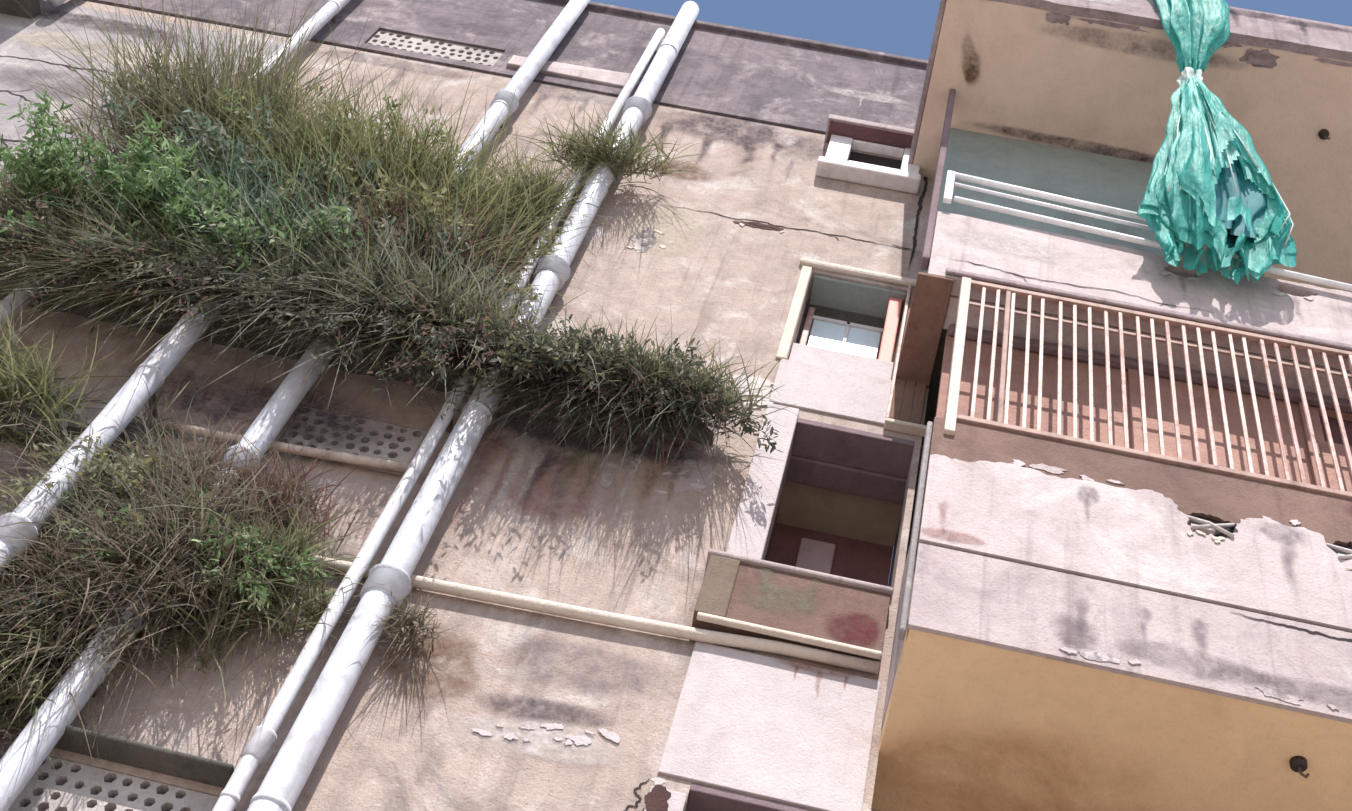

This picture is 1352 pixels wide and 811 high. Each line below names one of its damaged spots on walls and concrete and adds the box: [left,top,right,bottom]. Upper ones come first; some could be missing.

peeling [1045,12,1151,33]
peeling [1221,42,1280,69]
crack [669,177,928,269]
crack [954,259,1219,314]
damp [492,414,680,516]
peeling [1011,460,1125,485]
spalling [1187,515,1236,543]
spalling [1326,543,1352,569]
crack [1229,611,1352,641]
peeling [472,720,621,761]
spalling [644,777,671,811]